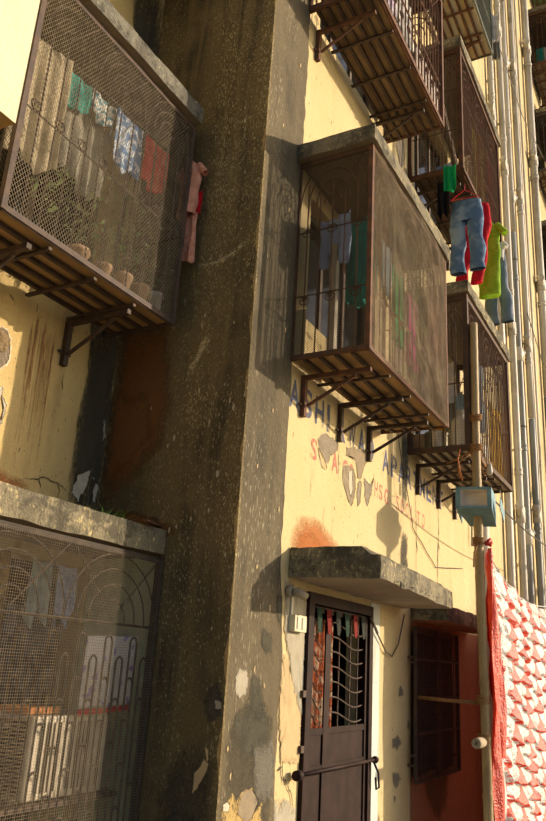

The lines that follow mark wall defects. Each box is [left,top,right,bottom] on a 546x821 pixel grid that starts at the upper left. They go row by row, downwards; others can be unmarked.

flaking render [0,326,12,370]
rust [0,474,25,489]
flaking render [71,470,99,502]
rust [292,522,335,548]
peeling [224,637,255,698]
peeling [192,728,229,793]
peeling [221,788,262,821]
peeling [274,798,296,821]